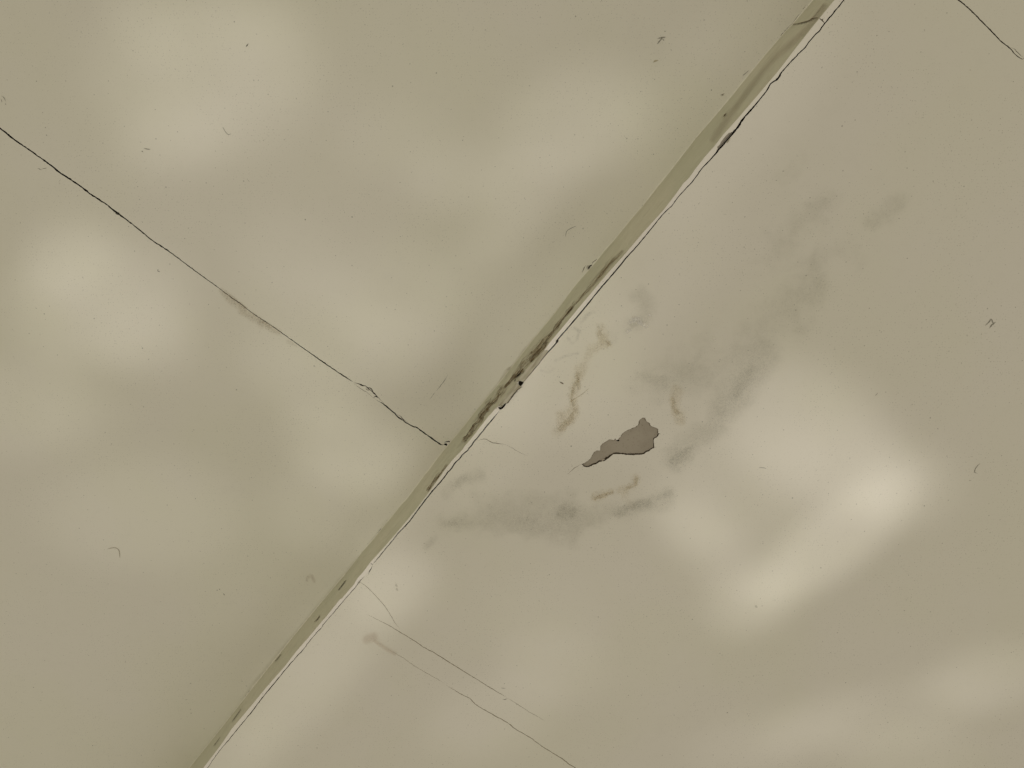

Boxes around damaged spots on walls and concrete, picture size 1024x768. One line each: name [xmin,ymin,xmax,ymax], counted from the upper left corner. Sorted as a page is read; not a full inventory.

crack [958,0,1022,59]
damp [464,251,622,439]
crack [0,128,575,768]
peeling [569,418,659,473]